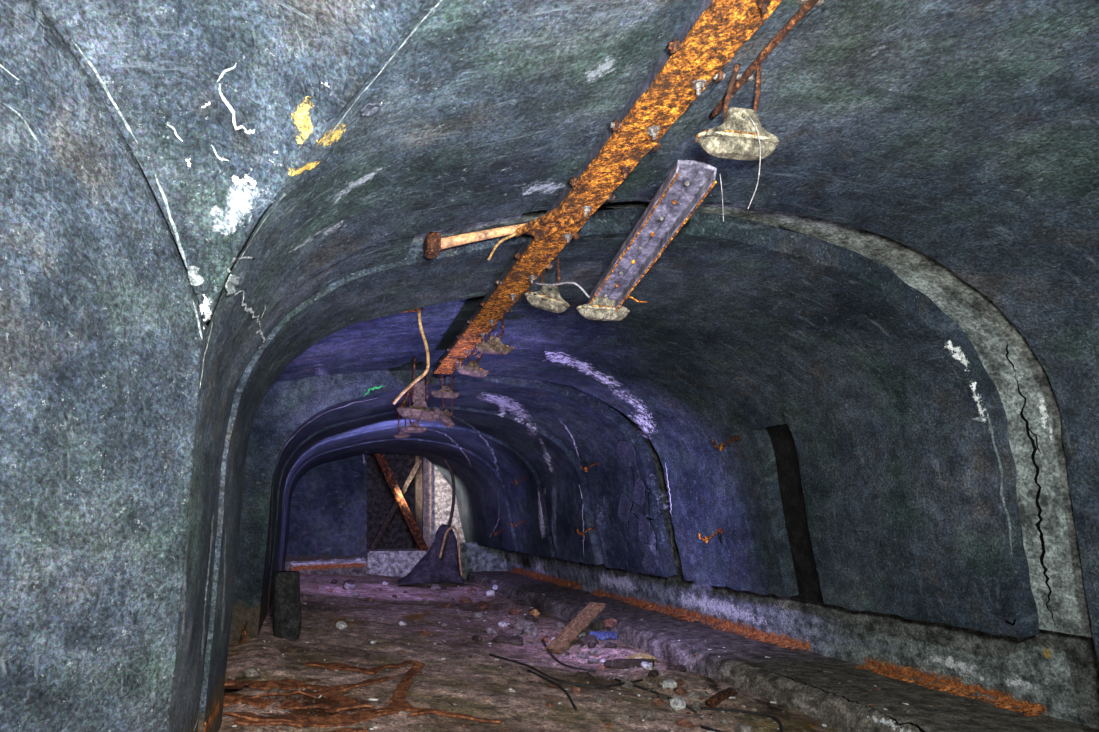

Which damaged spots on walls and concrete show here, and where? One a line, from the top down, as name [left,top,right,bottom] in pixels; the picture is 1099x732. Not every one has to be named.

efflorescence [210,186,265,235]
rust [527,173,717,311]
crack [1006,343,1055,626]
rust [508,567,812,651]
crack [749,664,926,732]
rust [855,656,1049,717]